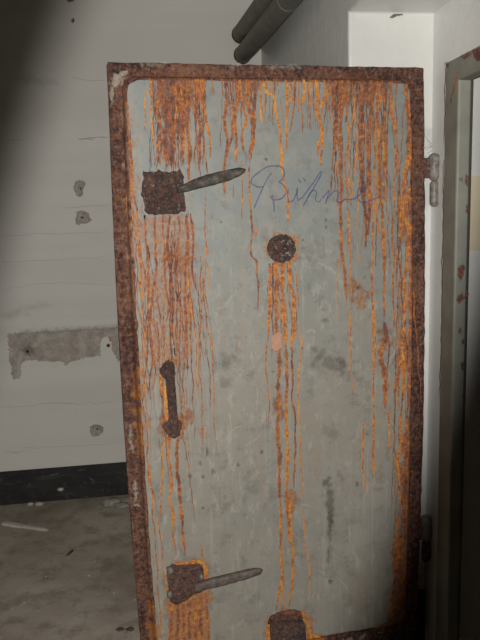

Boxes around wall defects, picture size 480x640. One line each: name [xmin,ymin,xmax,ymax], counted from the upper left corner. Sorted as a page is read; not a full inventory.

peeling [8,328,120,379]
corrosion [126,101,216,640]
corrosion [144,78,214,182]
corrosion [221,77,422,640]